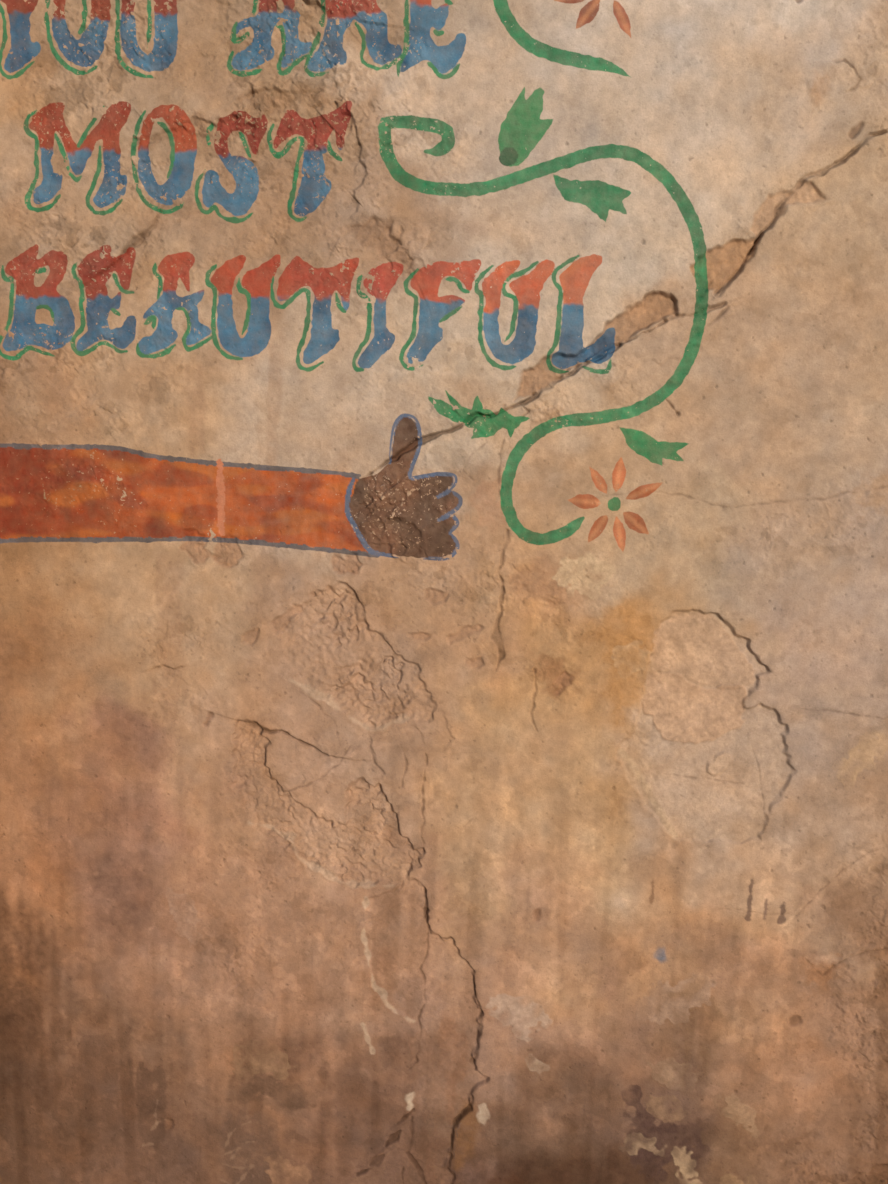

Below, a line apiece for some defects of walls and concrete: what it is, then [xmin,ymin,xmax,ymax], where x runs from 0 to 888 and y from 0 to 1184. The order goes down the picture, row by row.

crack [360,127,888,734]
water stain [70,835,161,965]
crack [235,717,353,794]
spalling [226,554,554,1184]
crack [418,749,429,854]
spalling [550,669,580,700]
spalling [613,607,799,848]
water stain [0,866,80,1133]
water stain [113,1045,179,1159]
water stain [205,1073,317,1184]
crack [421,886,488,1184]
water stain [467,995,736,1184]